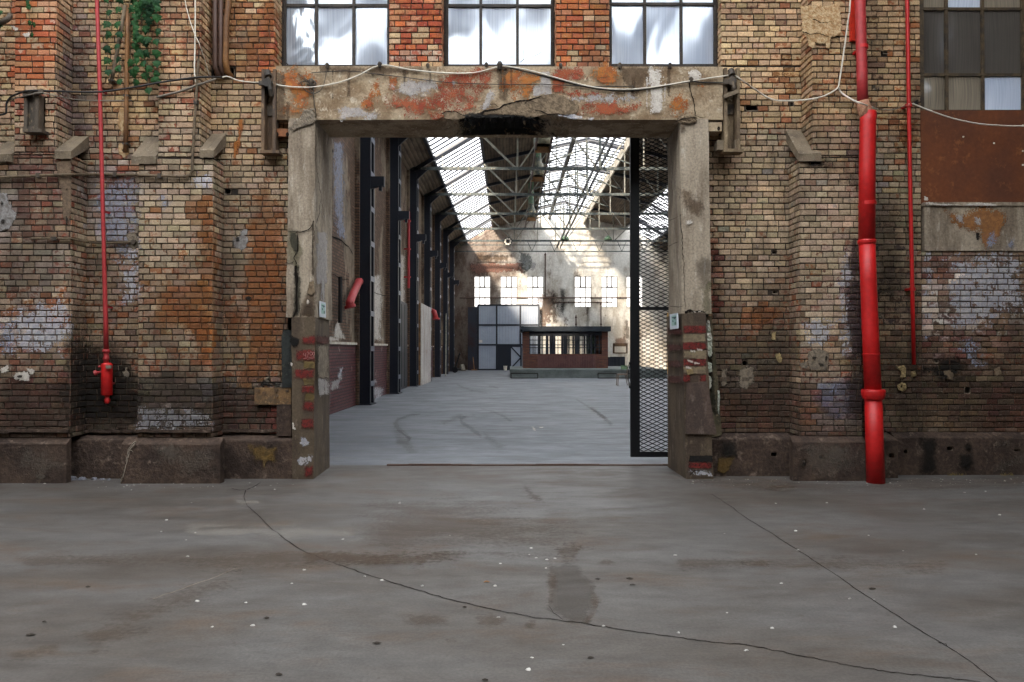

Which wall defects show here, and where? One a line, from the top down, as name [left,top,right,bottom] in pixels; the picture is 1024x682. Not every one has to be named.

spalling [800,4,842,48]
spalling [360,61,641,137]
peeling [669,90,697,124]
spalling [0,193,17,231]
spalling [306,221,315,308]
peeling [942,206,1007,249]
damp [8,296,219,430]
crack [232,482,997,682]